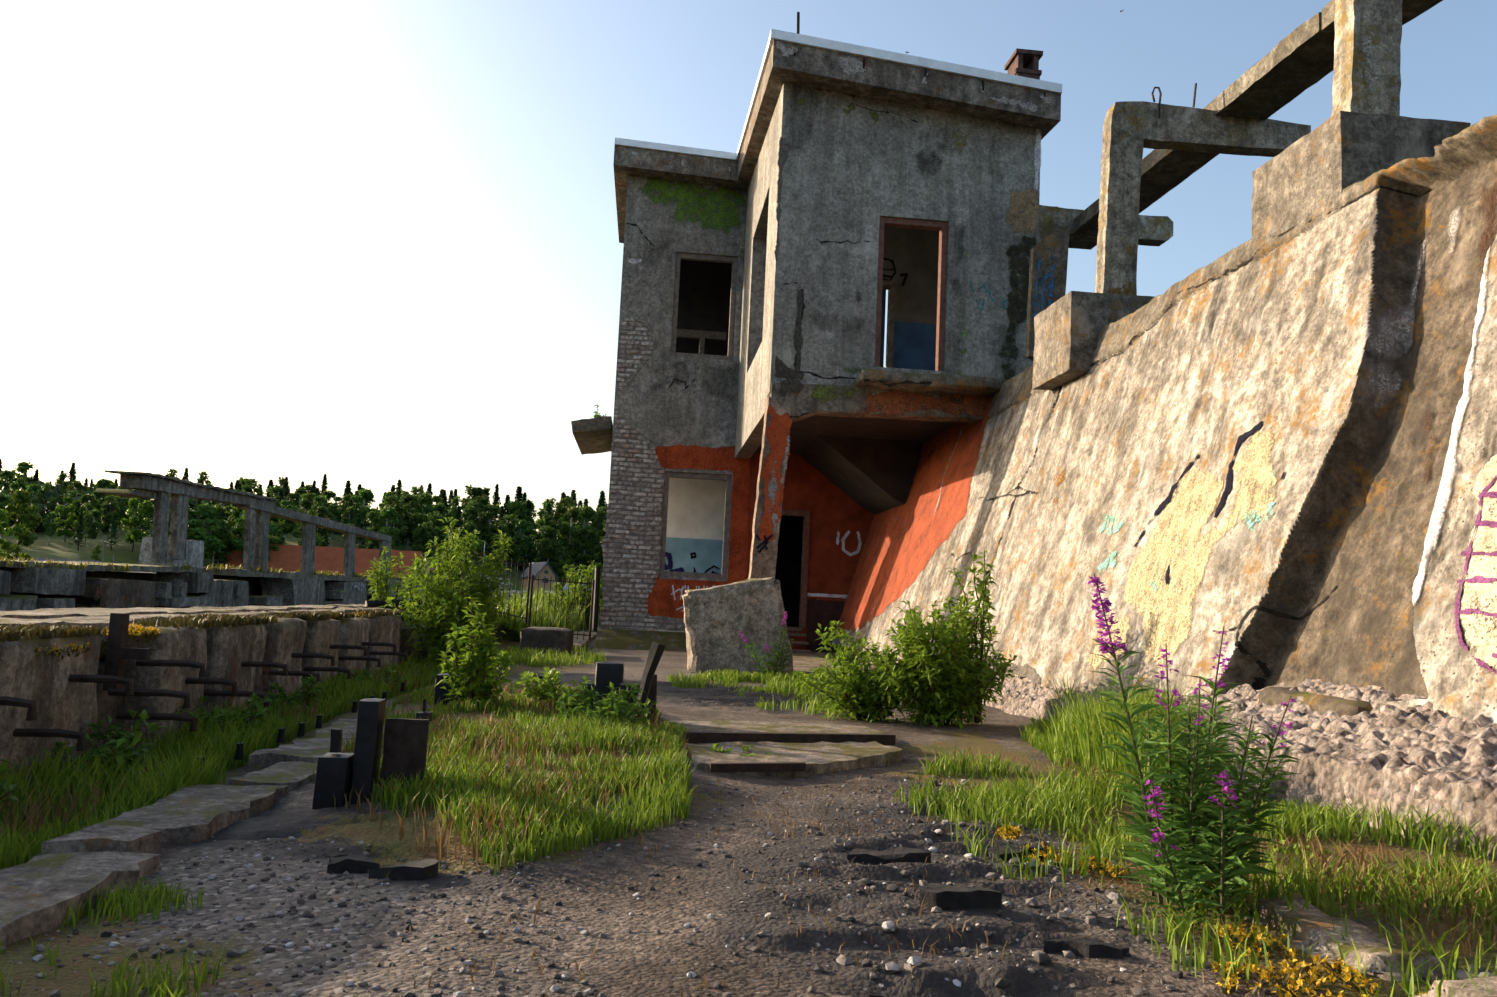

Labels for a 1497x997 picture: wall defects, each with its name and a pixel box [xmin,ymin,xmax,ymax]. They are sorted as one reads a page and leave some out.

crack [1091,185,1432,366]
peeling [600,318,683,631]
crack [951,386,1063,581]